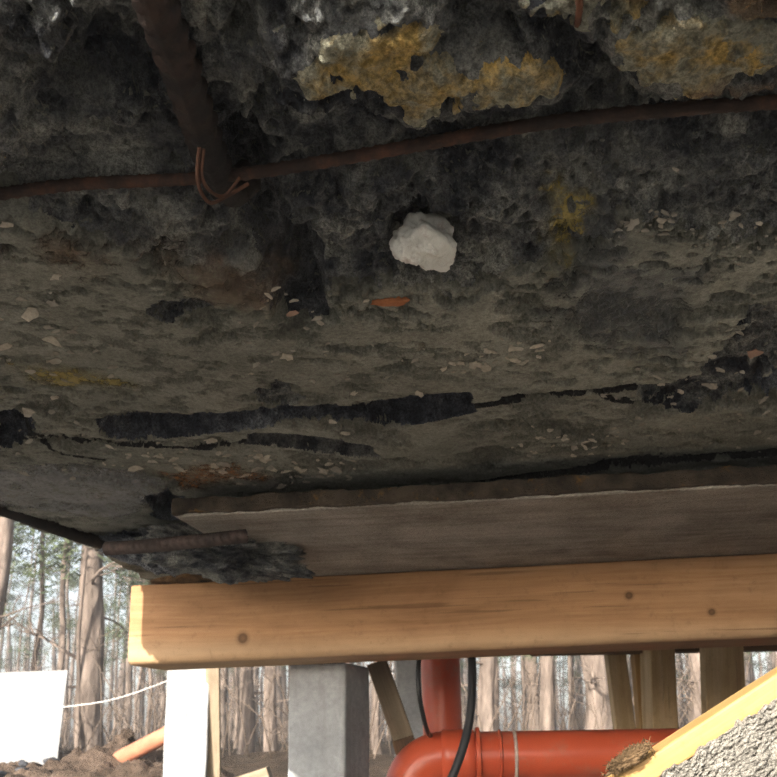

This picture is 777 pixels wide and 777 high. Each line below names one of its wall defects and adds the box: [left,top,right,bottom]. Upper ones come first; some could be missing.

spalling [0,0,777,317]
peeling [16,292,59,322]
peeling [146,297,214,324]
crack [472,383,667,409]
crack [17,414,246,461]